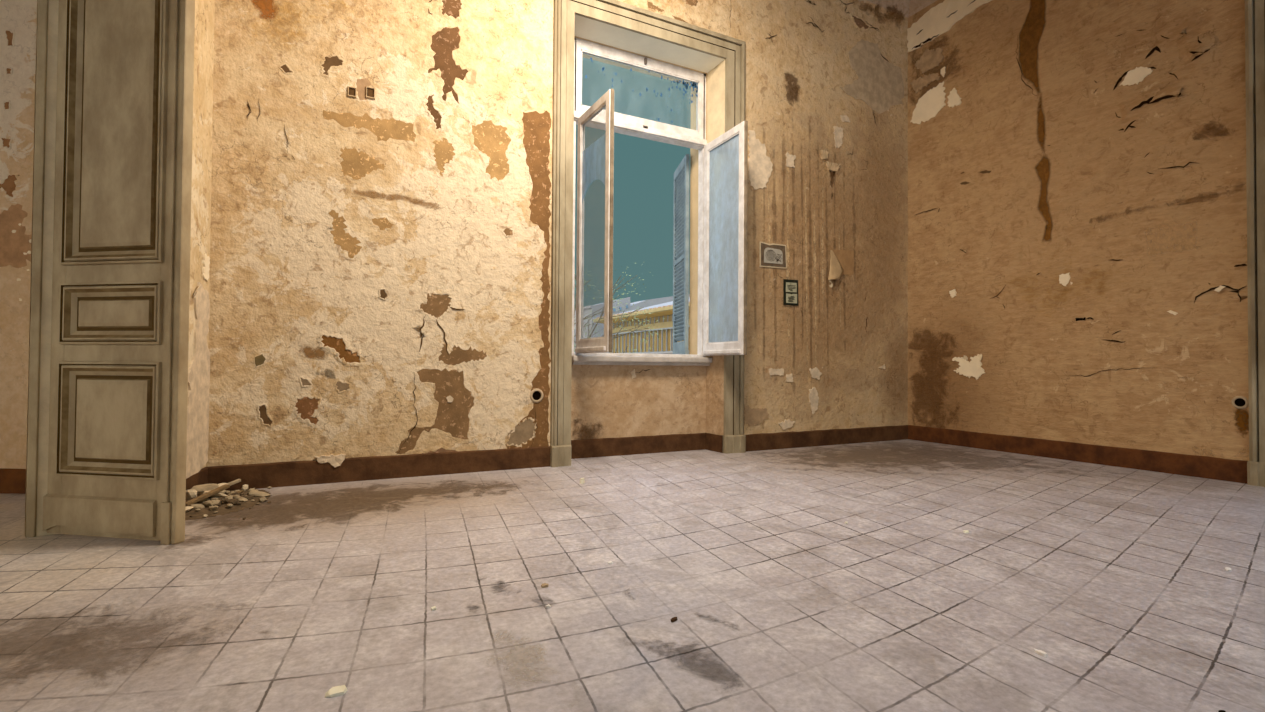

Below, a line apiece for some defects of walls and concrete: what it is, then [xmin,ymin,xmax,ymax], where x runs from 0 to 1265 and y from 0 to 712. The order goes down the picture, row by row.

peeling [907,0,992,124]
damp [1019,0,1052,241]
peeling [1119,67,1153,86]
flaking render [317,0,553,455]
peeling [952,354,985,380]